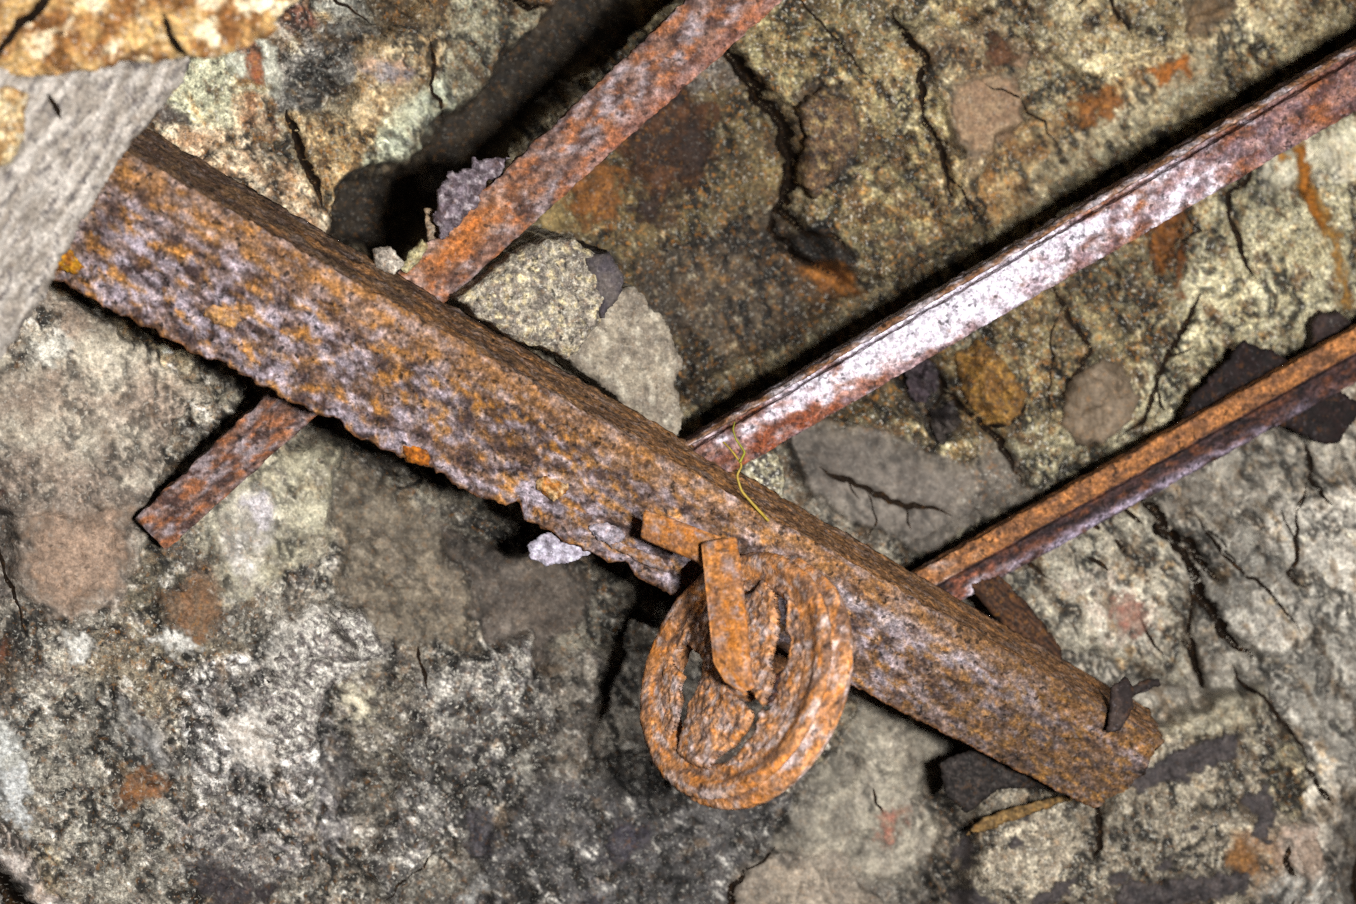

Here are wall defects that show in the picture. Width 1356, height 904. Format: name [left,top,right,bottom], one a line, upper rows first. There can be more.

rust [1067,84,1124,128]
rust [432,157,510,240]
rust [539,161,629,233]
crack [723,48,853,279]
rust [801,261,859,295]
rust [1145,211,1186,300]
rust [1278,141,1353,311]
rust [527,532,591,567]
crack [1087,441,1334,805]
crack [0,872,35,904]
crack [1282,845,1297,904]
crack [1348,858,1356,904]